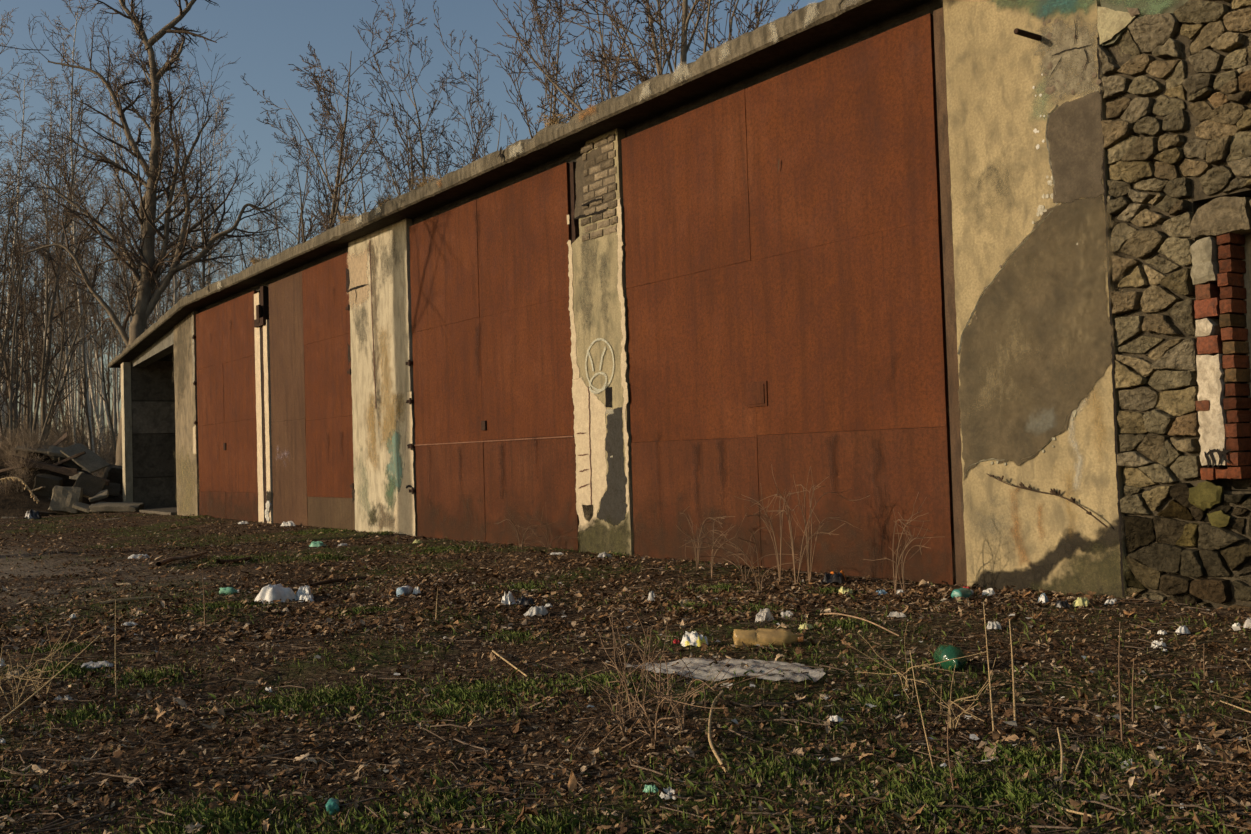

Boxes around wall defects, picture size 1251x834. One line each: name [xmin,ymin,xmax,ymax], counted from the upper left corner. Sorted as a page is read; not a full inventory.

leakage [356,240,397,425]
flaking render [567,133,629,532]
flaking render [957,0,1172,479]